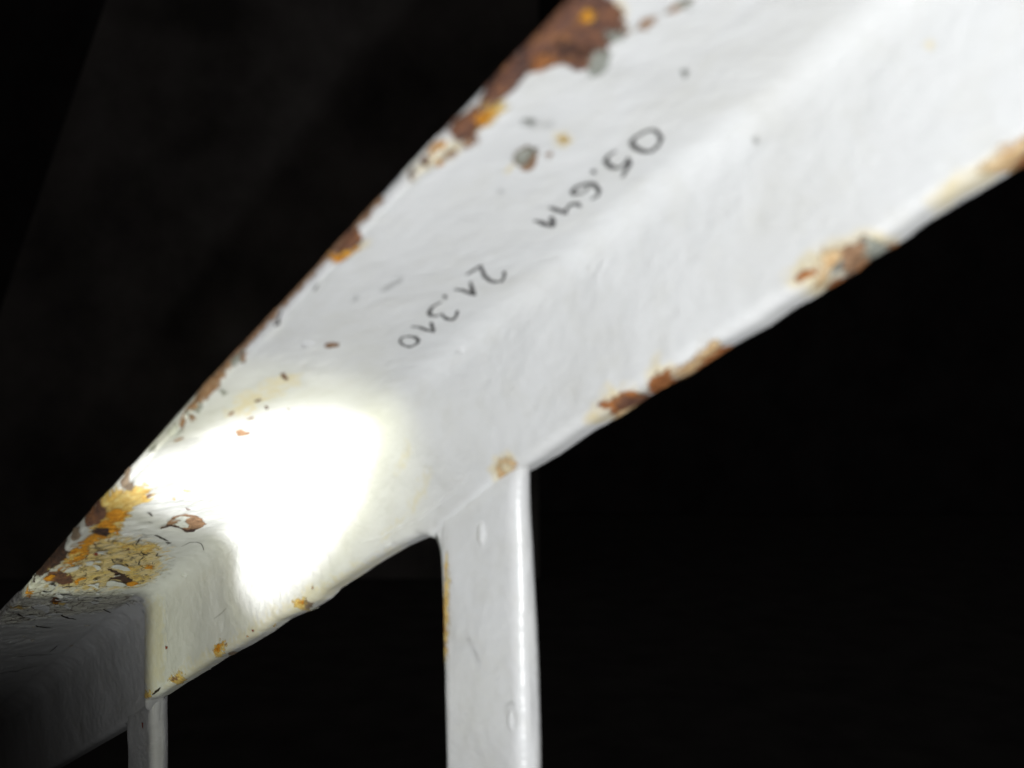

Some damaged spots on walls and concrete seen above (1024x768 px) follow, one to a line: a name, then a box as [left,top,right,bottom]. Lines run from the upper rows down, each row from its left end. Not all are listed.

rust [402,71,520,188]
rust [546,127,580,153]
rust [774,219,914,302]
rust [184,196,384,423]
rust [576,339,733,428]
rust [484,444,520,486]
peeling [160,508,206,533]
peeling [0,551,144,627]